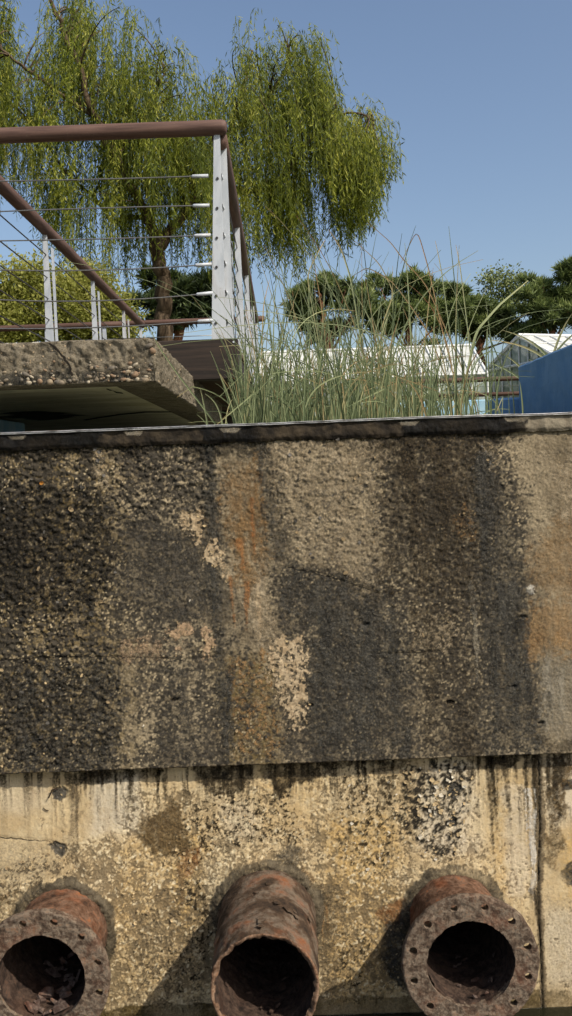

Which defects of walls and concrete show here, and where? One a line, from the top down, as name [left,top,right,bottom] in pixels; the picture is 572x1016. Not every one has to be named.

water stain [0,432,114,461]
corrosion [216,457,269,619]
water stain [11,656,191,856]
water stain [94,416,572,1007]